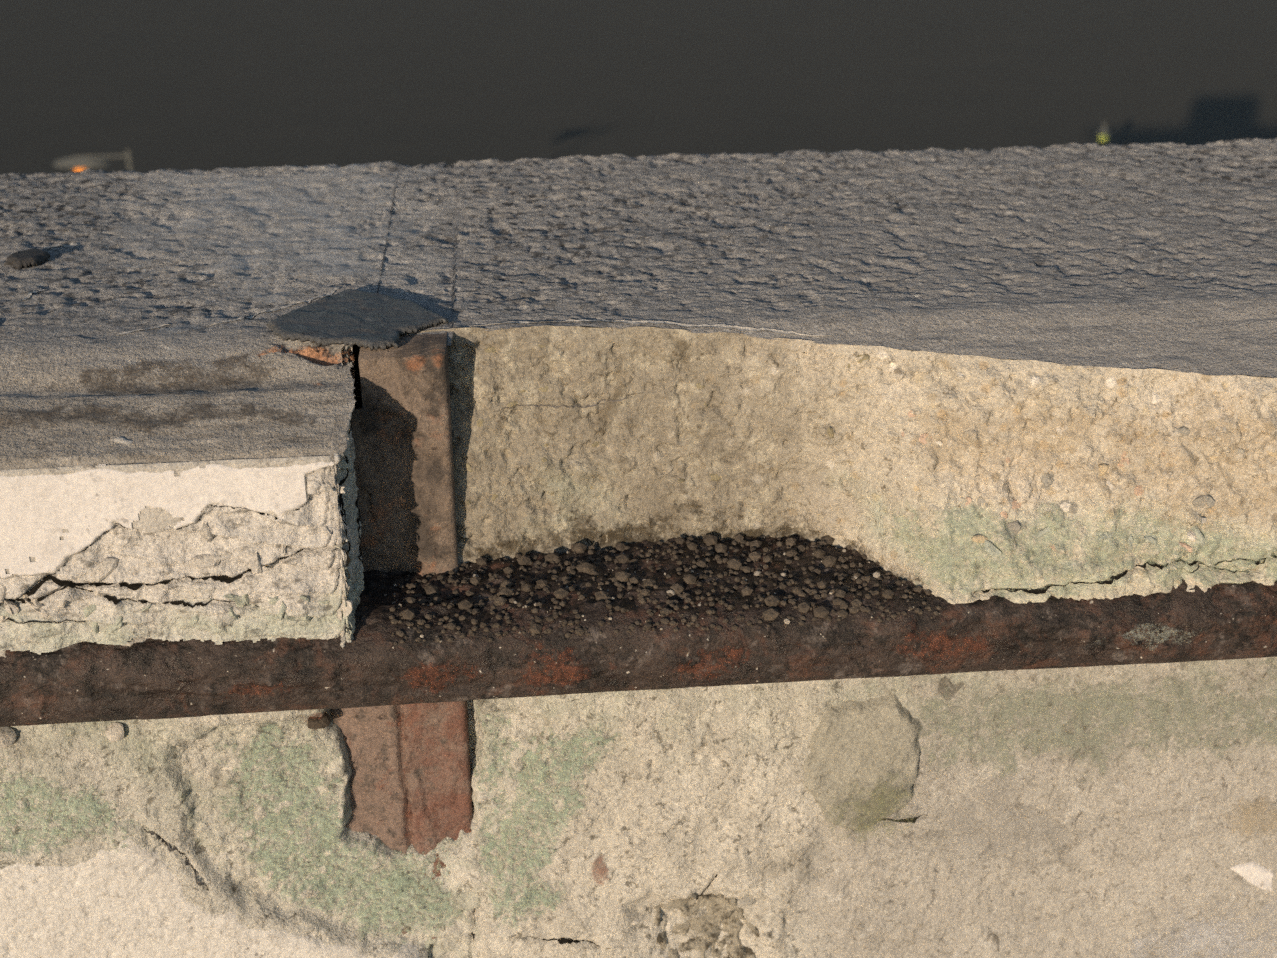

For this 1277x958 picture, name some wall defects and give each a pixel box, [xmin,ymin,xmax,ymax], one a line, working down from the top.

crack [0,412,363,624]
spalling [0,408,364,655]
spalling [419,319,1277,604]
crack [973,553,1277,595]